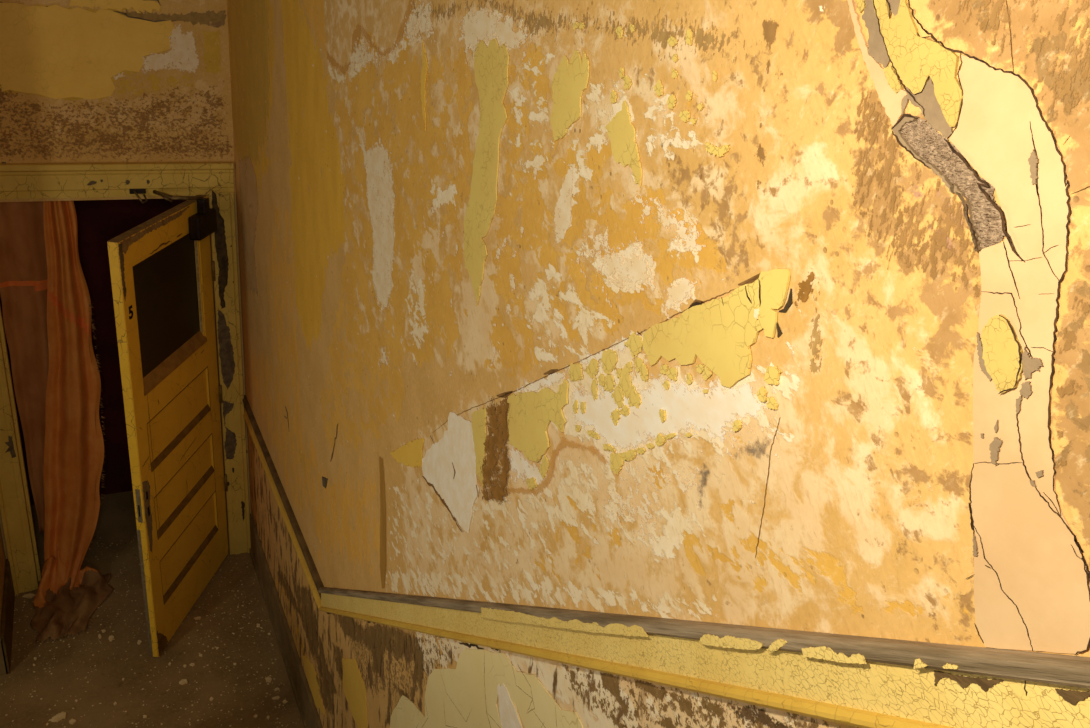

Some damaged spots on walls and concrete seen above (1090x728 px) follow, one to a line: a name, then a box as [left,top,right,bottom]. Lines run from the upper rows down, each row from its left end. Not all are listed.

peeling [0,0,226,99]
leakage [0,81,232,161]
peeling [497,68,792,553]
flaking render [848,0,1090,654]
crack [873,0,1090,651]
flaking render [390,408,487,533]
crack [755,418,780,557]
peeling [390,643,584,728]
peeling [481,607,648,637]
peeling [802,646,867,665]
peeling [913,659,1004,692]
peeling [1055,688,1090,705]